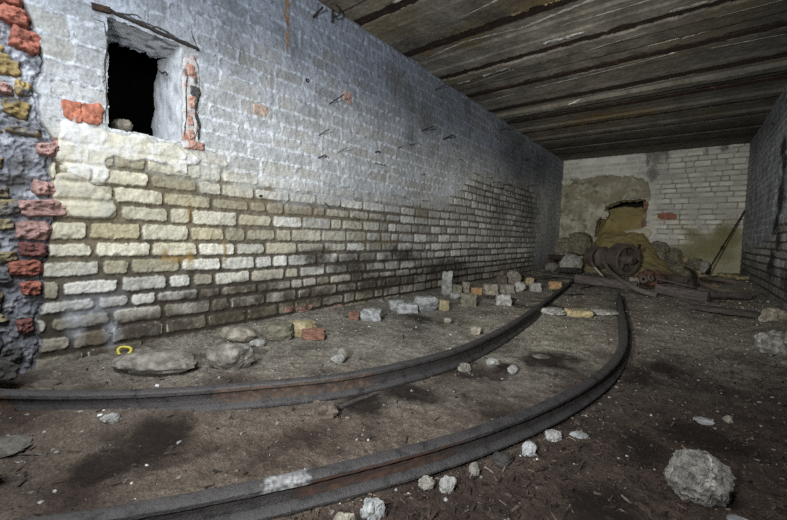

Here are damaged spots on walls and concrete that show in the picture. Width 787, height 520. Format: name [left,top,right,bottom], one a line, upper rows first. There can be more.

spalling [61,99,104,126]
peeling [188,96,204,151]
spalling [594,198,677,237]